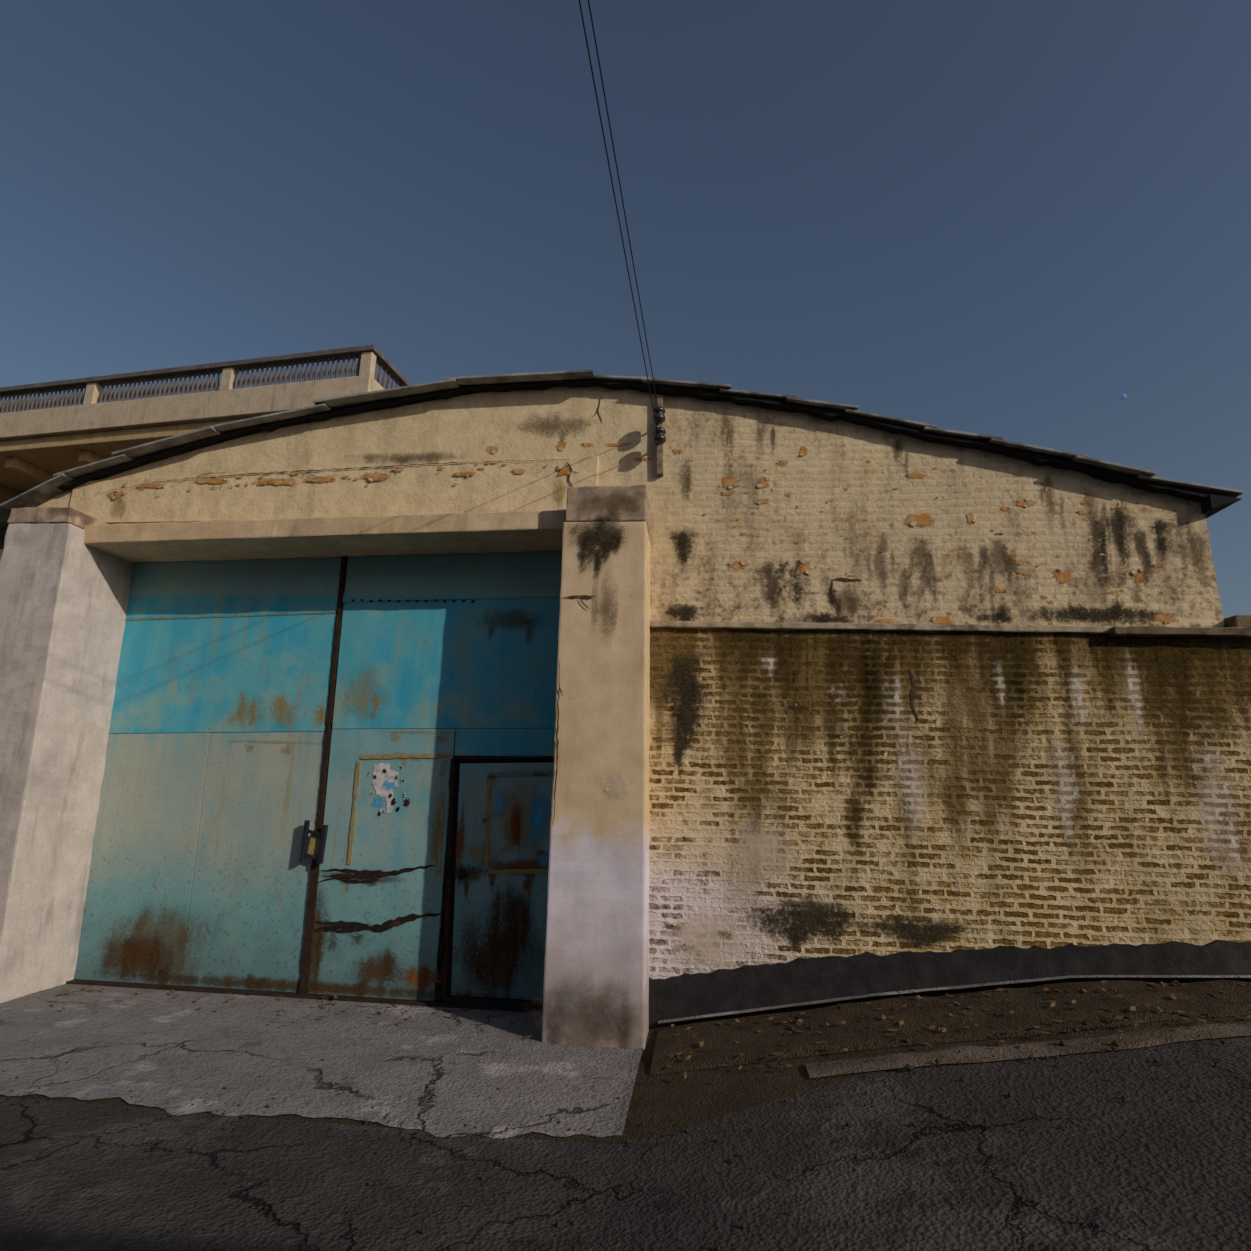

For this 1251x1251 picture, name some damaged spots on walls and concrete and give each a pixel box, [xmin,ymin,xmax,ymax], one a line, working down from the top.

flaking render [107,483,174,501]
flaking render [188,467,404,491]
flaking render [437,441,571,485]
leakage [677,544,690,570]
flaking render [904,513,936,541]
flaking render [1053,553,1107,583]
leakage [1092,508,1168,587]
leakage [673,688,696,773]
leakage [715,588,1251,869]
corrosion [450,805,544,996]
corrosion [103,895,442,998]
leakage [784,922,807,950]